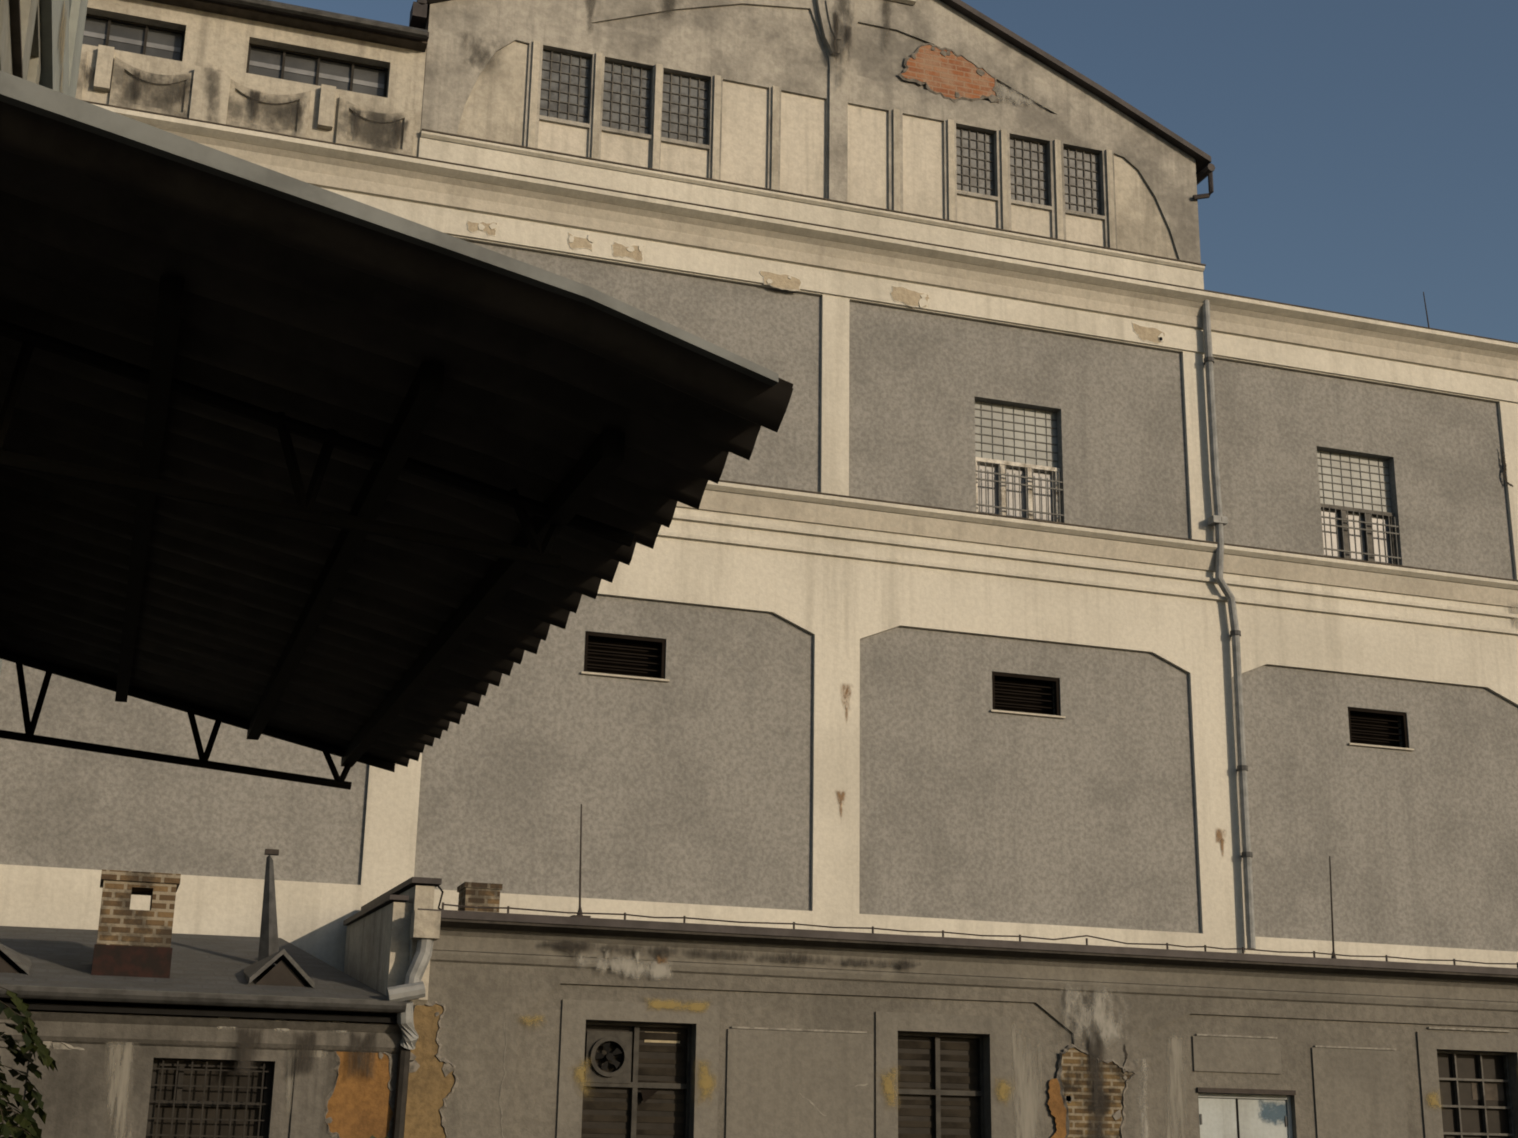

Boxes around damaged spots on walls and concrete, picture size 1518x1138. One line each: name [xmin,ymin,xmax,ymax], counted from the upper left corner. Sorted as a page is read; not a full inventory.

flaking render [898,43,999,104]
flaking render [323,1001,459,1138]
flaking render [1047,1044,1138,1138]
leakage [1066,989,1121,1138]